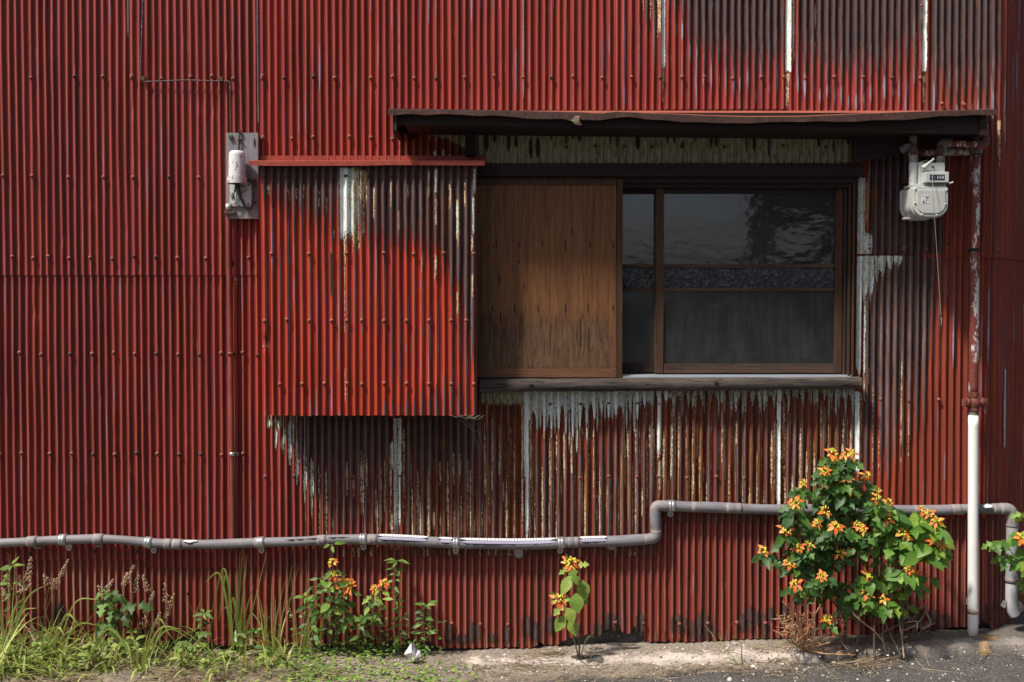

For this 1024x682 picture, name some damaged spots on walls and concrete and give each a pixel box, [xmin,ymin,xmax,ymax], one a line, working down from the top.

peeling [318,167,375,328]
corrosion [261,146,964,558]
peeling [711,177,903,521]
corrosion [987,291,1003,396]
peeling [346,391,707,553]